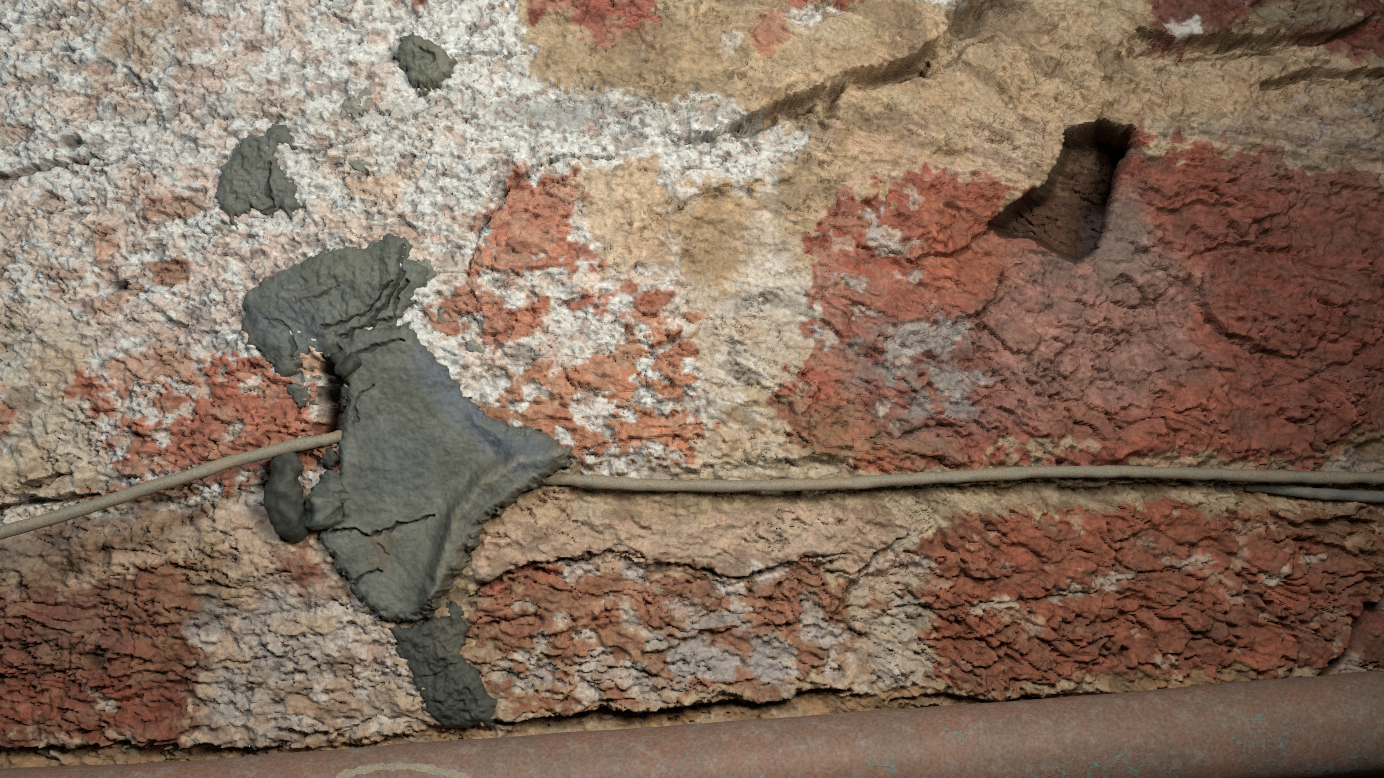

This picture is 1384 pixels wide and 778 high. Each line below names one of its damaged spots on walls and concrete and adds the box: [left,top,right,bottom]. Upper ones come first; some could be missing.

peeling [527,0,669,51]
peeling [717,28,747,58]
peeling [783,3,841,30]
peeling [925,0,968,14]
crack [1136,12,1384,91]
peeling [0,386,13,459]
crack [467,534,910,621]
spalling [464,492,1384,722]
spalling [0,544,288,752]
spalling [343,612,408,684]